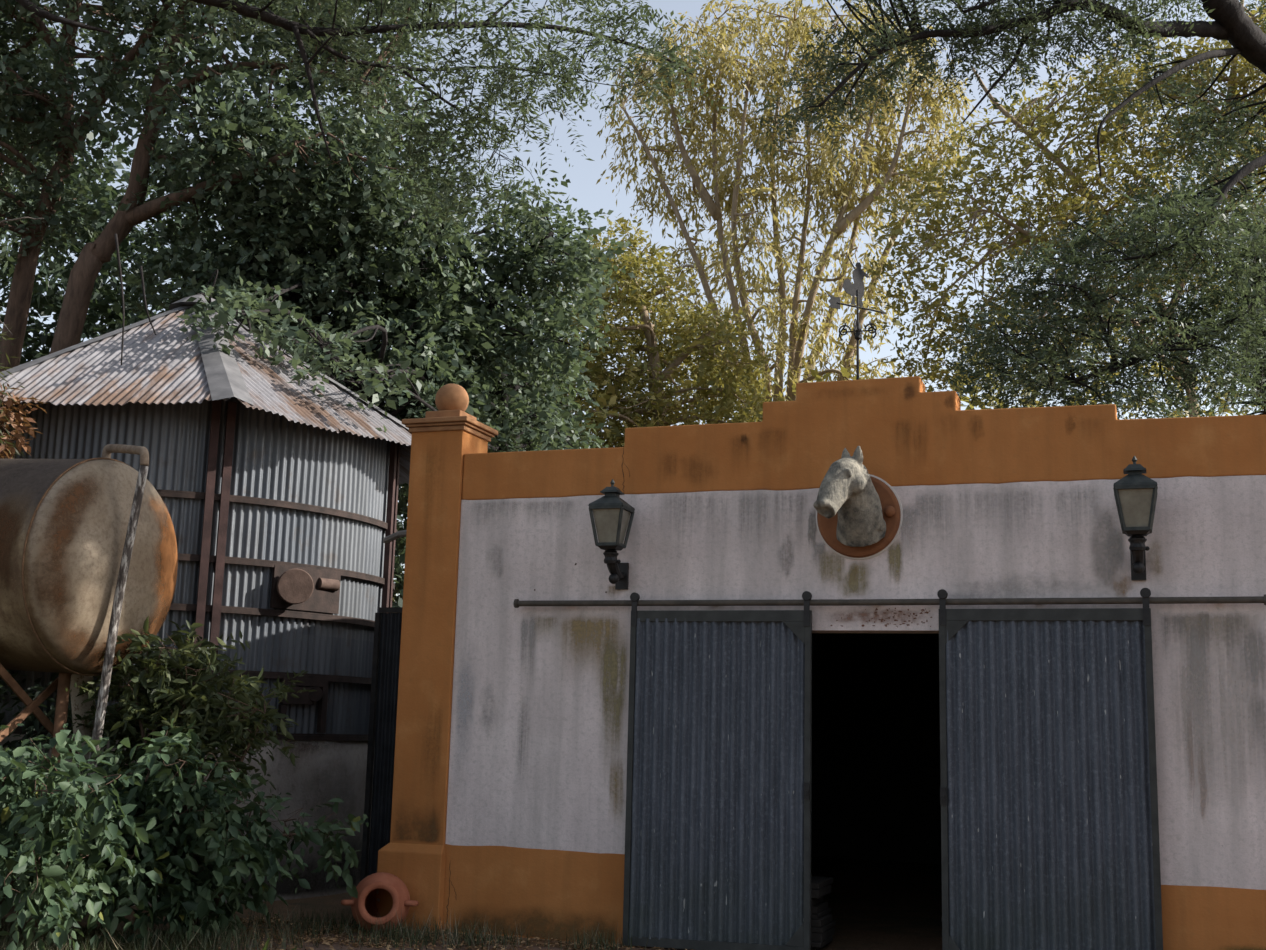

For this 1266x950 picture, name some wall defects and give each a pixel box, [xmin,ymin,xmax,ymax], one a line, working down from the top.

damp [522,619,625,733]